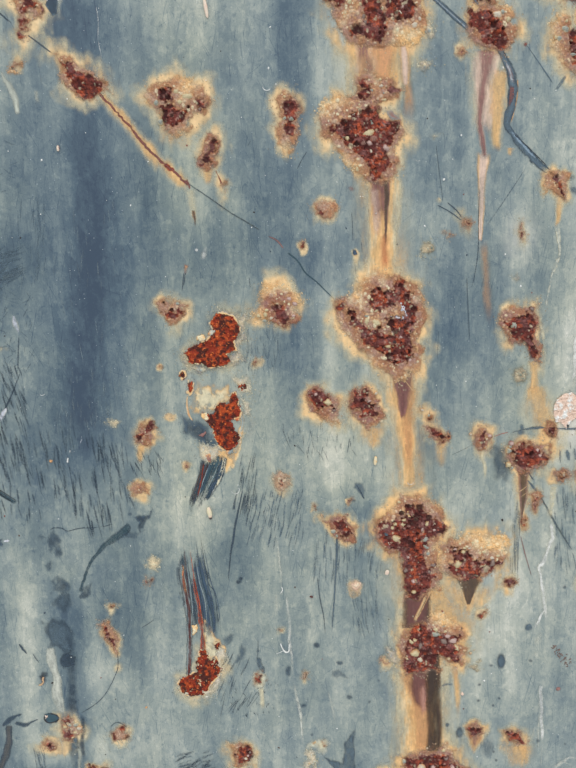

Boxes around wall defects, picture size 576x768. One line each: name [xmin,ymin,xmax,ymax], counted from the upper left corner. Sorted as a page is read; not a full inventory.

rust [542,0,576,86]
rust [135,61,229,199]
rust [269,85,305,159]
rust [538,165,571,223]
rust [297,239,308,256]
rust [248,271,310,329]
rust [300,0,530,768]
rust [469,297,571,531]